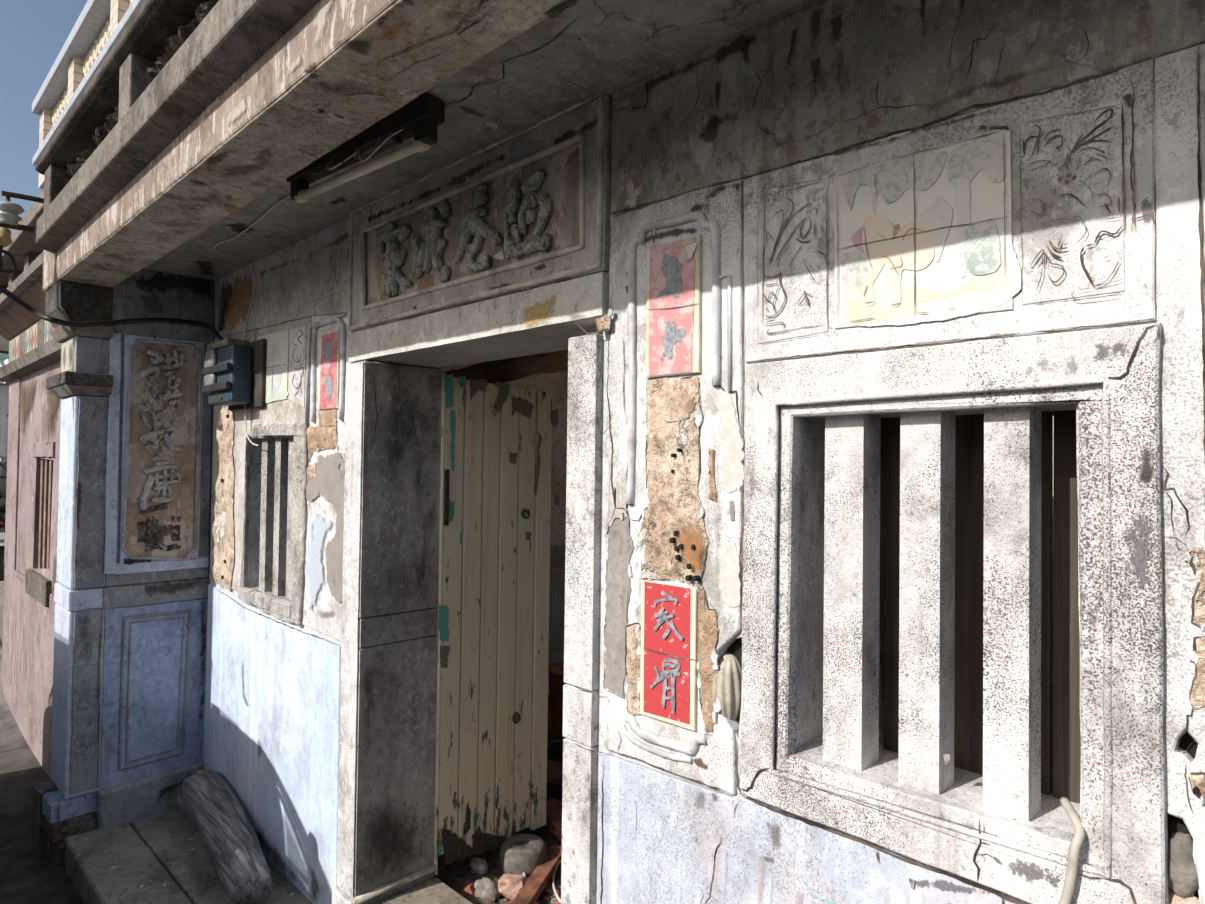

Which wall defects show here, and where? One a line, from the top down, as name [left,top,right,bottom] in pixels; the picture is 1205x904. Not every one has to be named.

crack [377,0,489,69]
crack [447,15,583,104]
crack [609,10,1155,253]
spalling [306,409,346,481]
peeling [305,513,331,609]
spalling [602,376,744,735]
crack [710,489,743,629]
spalling [1181,544,1205,715]
peeling [441,803,506,866]
crack [576,731,1029,904]
spalling [1185,768,1205,805]
crack [1077,873,1136,904]